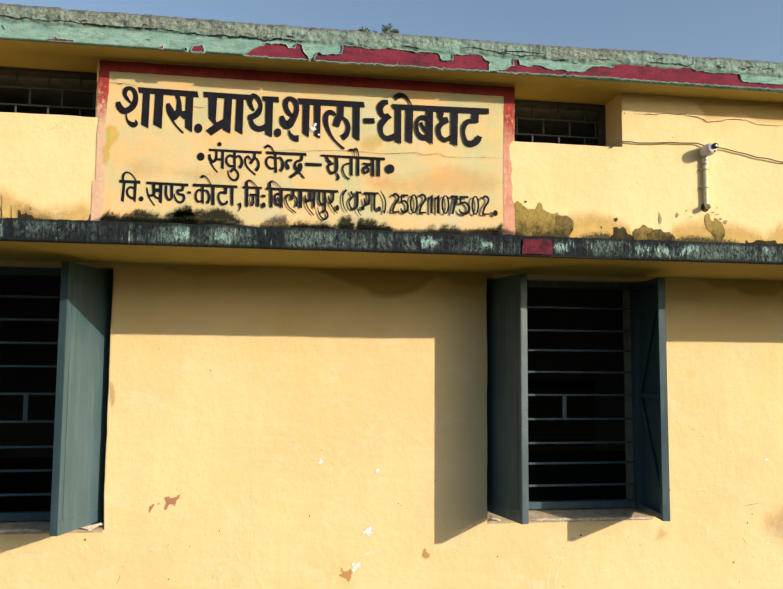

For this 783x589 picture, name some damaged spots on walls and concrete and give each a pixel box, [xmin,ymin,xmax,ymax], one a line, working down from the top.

peeling [183,44,205,54]
peeling [242,42,783,91]
crack [633,113,781,126]
water stain [0,195,87,220]
water stain [96,205,523,236]
water stain [569,217,631,239]
water stain [672,227,783,244]
peeling [149,495,180,512]